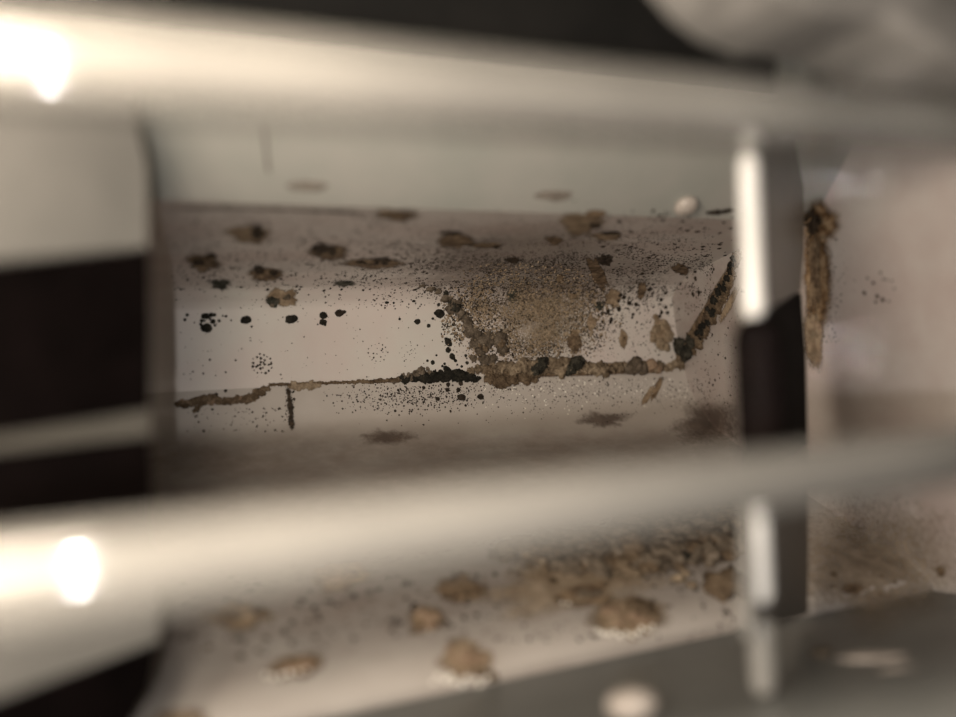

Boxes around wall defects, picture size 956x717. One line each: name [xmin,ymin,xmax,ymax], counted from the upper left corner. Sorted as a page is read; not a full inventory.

damp [165,191,741,442]
rust [804,233,832,370]
crack [284,387,295,429]